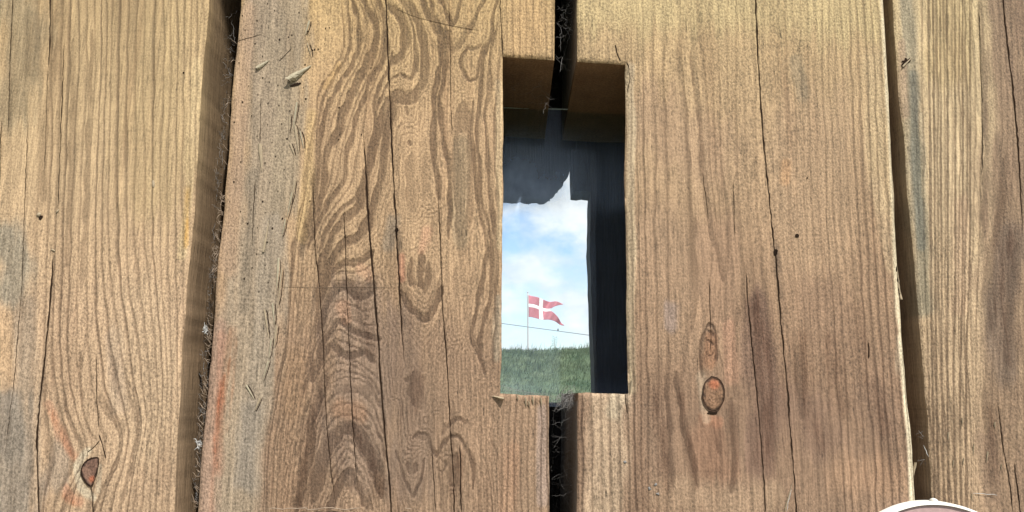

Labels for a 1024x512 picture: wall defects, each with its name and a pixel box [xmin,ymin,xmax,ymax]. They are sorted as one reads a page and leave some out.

crack [0,0,64,451]
crack [36,260,53,512]
crack [313,0,475,512]
crack [746,275,766,511]
crack [755,0,797,512]
crack [979,0,1023,231]